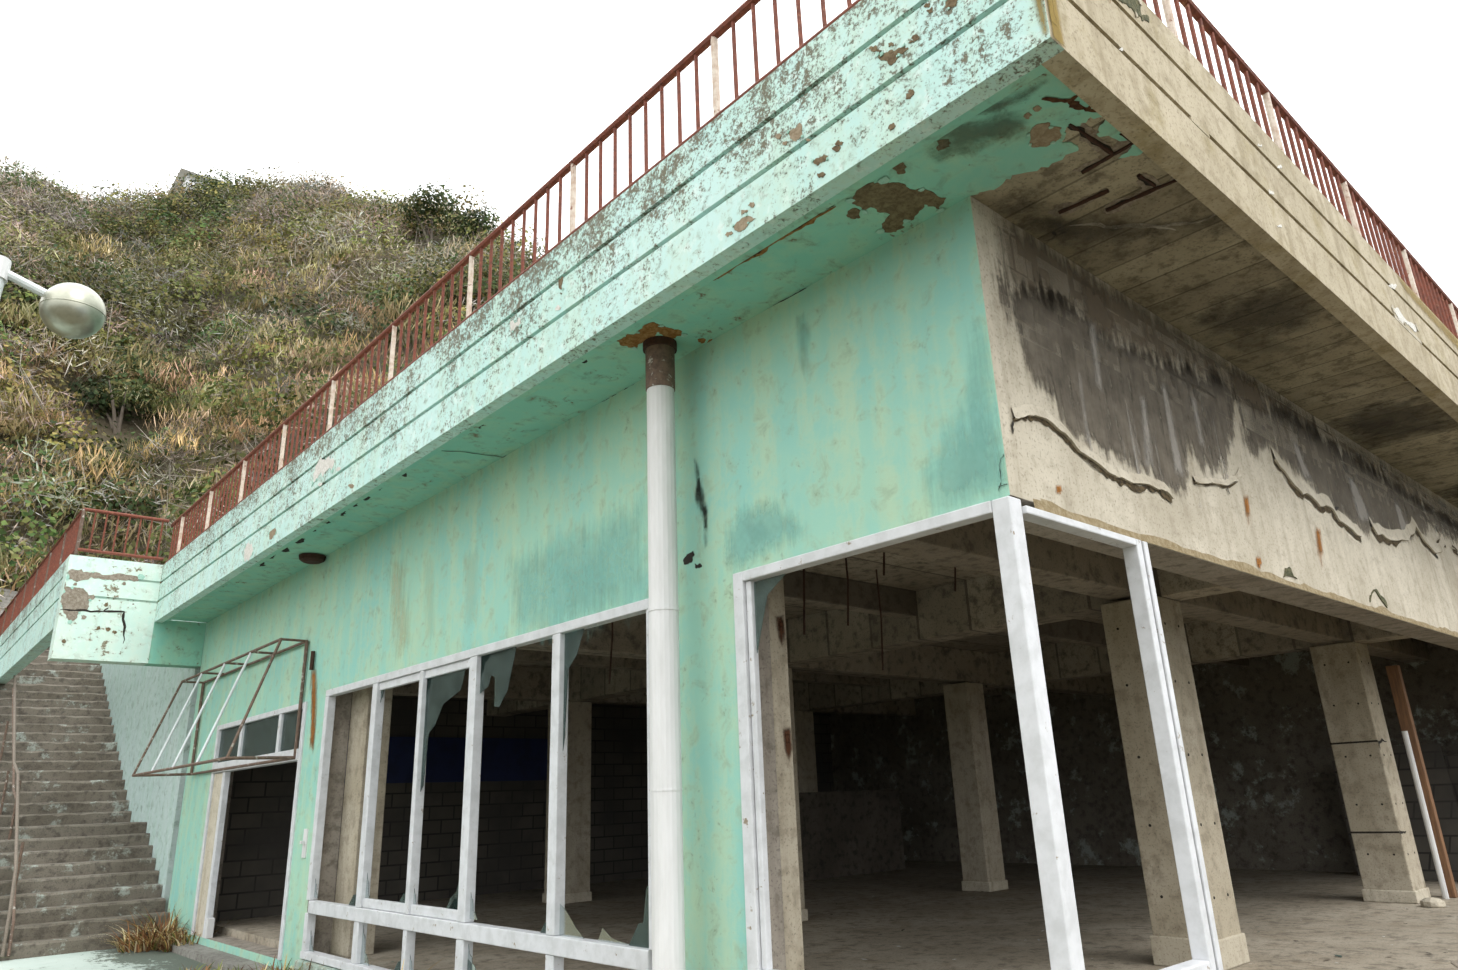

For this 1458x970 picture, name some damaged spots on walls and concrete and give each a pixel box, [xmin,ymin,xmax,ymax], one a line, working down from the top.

peeling [936,139,951,151]
crack [1041,95,1096,112]
peeling [846,162,946,234]
damp [997,206,1458,545]
crack [998,404,1458,559]
peeling [52,569,145,653]